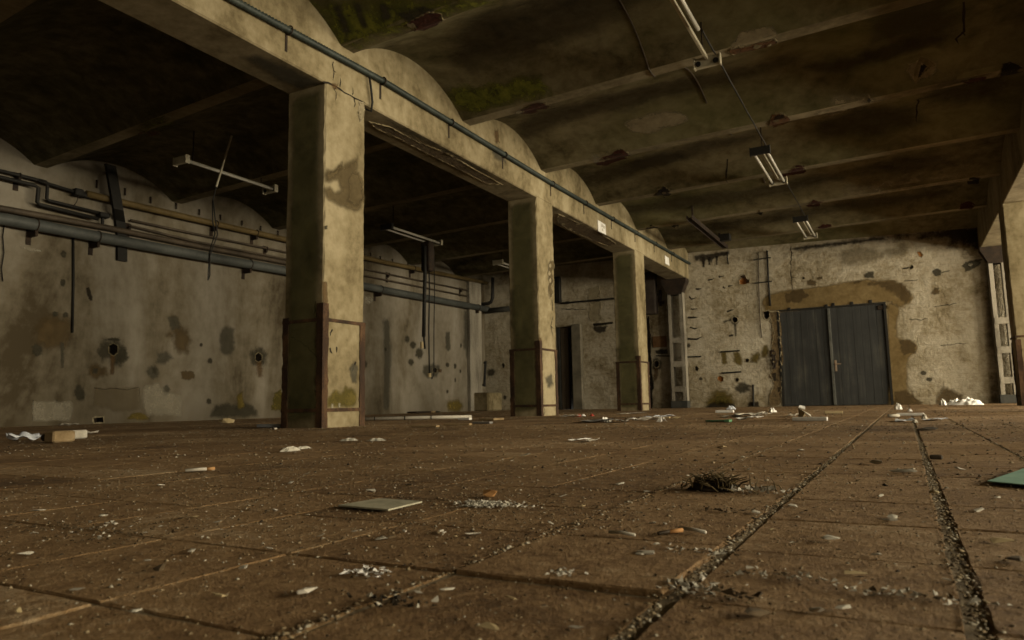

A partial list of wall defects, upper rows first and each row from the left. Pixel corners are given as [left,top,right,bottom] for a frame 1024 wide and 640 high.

crack [323,62,365,107]
water stain [147,317,203,394]
water stain [208,327,235,363]
water stain [248,57,367,419]
water stain [762,272,922,405]
water stain [794,228,996,359]